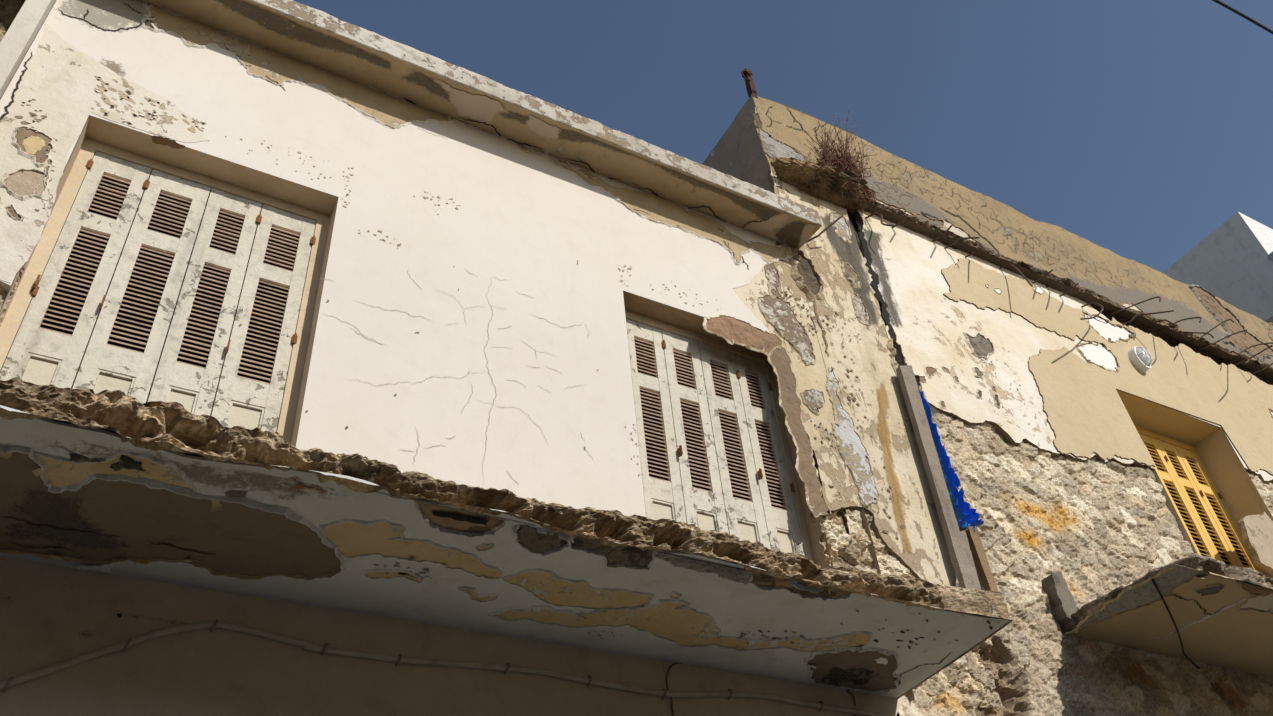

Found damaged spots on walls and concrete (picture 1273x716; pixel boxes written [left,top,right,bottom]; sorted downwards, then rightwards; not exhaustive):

crack [0,52,32,120]
peeling [91,75,207,133]
peeling [0,99,58,221]
peeling [141,5,908,545]
crack [323,268,590,482]
spalling [887,339,960,390]
spalling [963,332,1029,424]
peeling [1075,311,1135,373]
peeling [1189,284,1273,363]
peeling [0,377,1013,699]
crack [1117,594,1220,615]